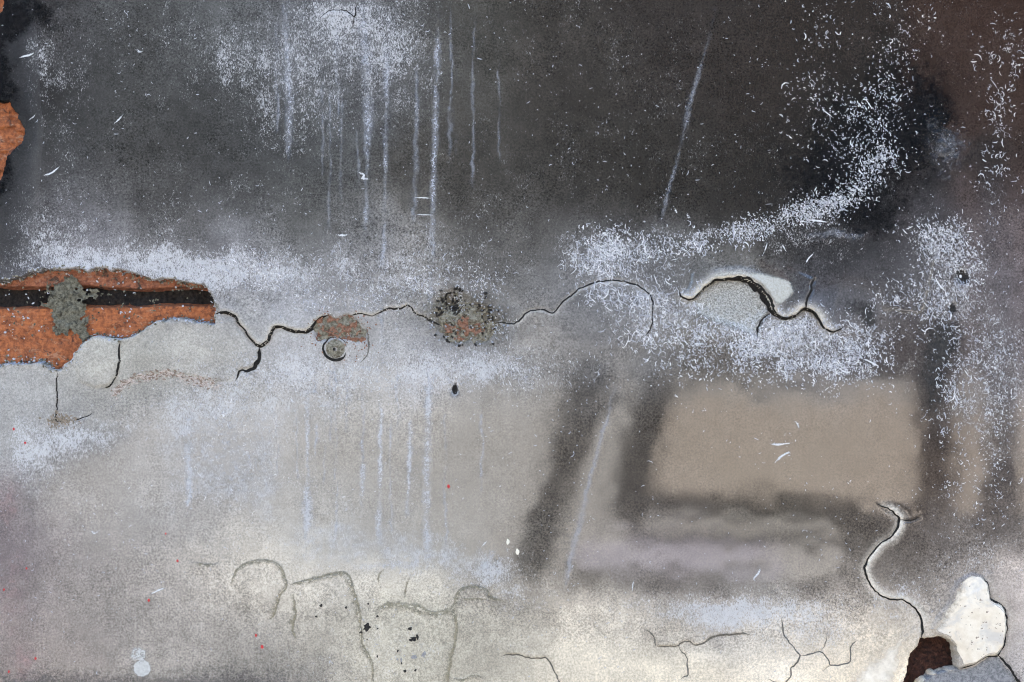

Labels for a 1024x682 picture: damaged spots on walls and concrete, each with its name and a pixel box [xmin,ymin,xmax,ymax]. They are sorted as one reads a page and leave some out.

flaking render [0,102,25,180]
crack [55,373,95,422]
flaking render [0,264,221,373]
crack [105,344,121,388]
crack [216,305,441,381]
crack [499,279,654,337]
leakage [151,3,1024,544]
peeling [695,272,793,335]
crack [678,276,844,337]
crack [863,505,924,637]
flaking render [856,576,1015,682]